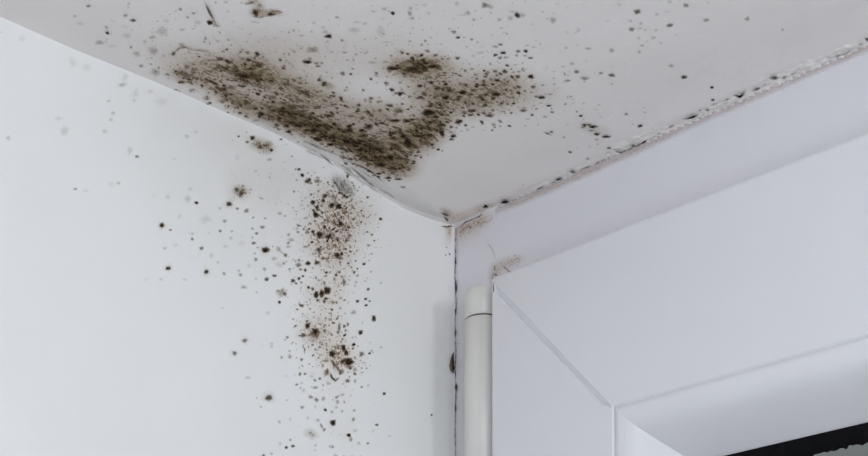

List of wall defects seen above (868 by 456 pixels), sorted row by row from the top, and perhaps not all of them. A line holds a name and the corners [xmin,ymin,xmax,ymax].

water stain [140,38,555,401]
peeling [489,35,868,208]